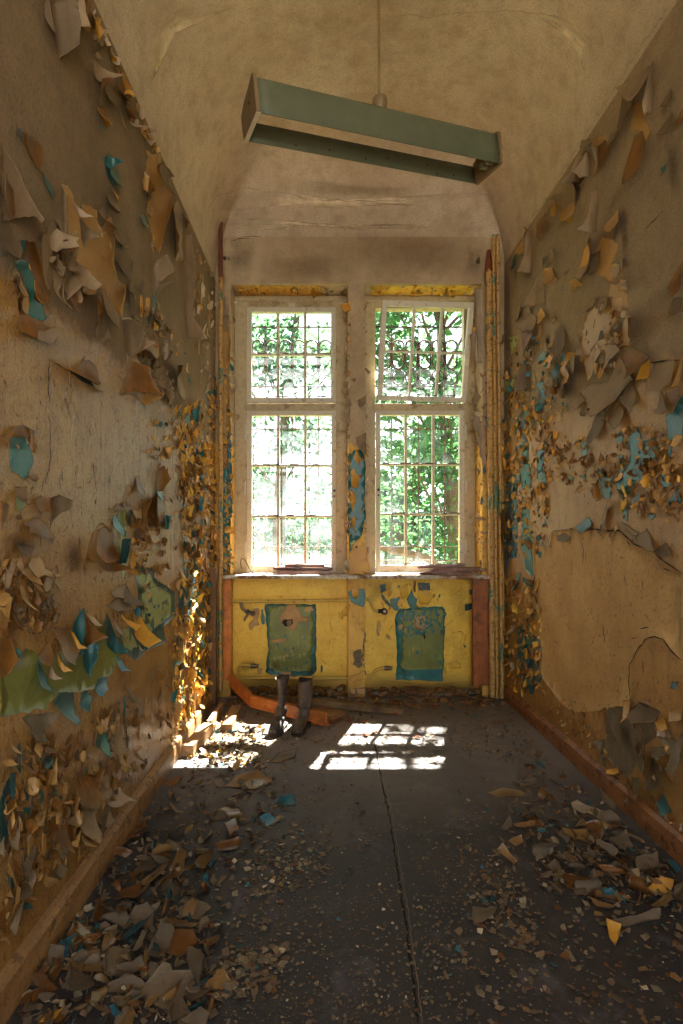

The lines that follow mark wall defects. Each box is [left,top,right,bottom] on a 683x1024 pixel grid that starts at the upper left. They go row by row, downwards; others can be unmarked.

peeling [0,0,488,945]
flaking render [497,62,683,927]
crack [606,614,682,695]
peeling [18,839,231,1024]
crack [374,742,423,1023]